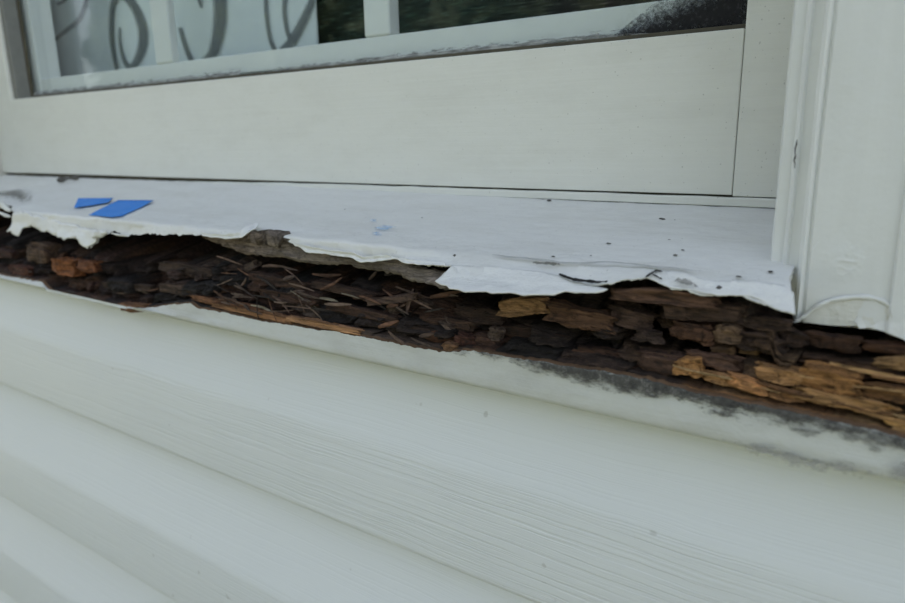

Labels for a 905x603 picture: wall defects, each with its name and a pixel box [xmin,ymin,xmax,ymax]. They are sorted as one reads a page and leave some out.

peeling [0,200,129,249]
peeling [200,223,259,239]
peeling [295,243,608,296]
peeling [647,270,905,341]
leakage [478,352,905,450]